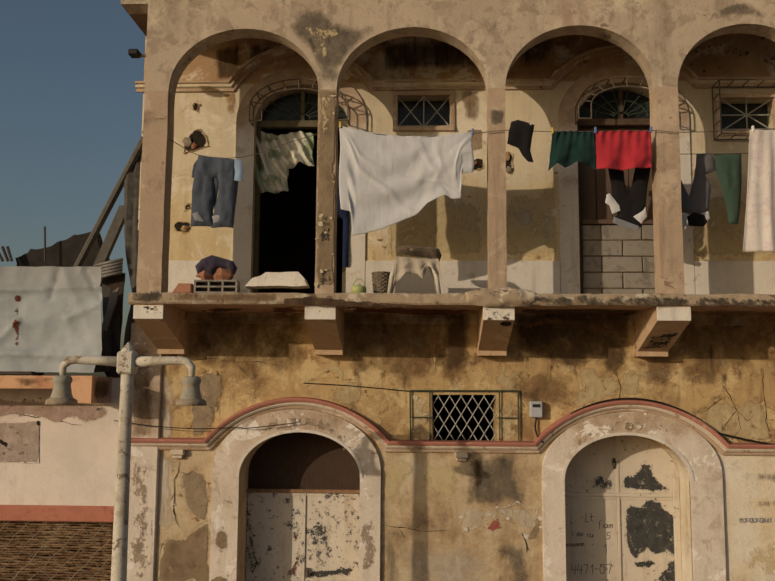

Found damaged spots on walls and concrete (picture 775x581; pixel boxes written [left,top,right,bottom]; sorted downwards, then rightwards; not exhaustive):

leakage [295,12,360,78]
flaking render [279,91,413,315]
leakage [346,313,466,380]
leakage [517,314,628,371]
flaking render [0,397,105,439]
crack [705,379,775,440]
leakage [469,457,520,503]
flaking render [130,462,227,581]
peeling [307,522,337,551]
peeling [309,566,352,578]
peeling [361,521,376,569]
flaking render [459,501,542,543]